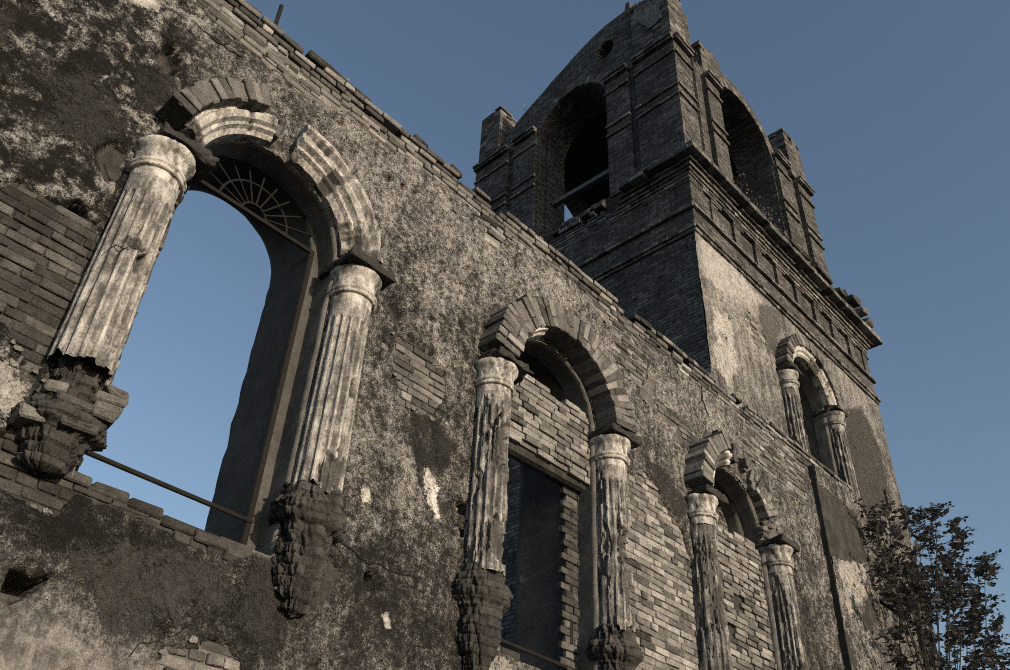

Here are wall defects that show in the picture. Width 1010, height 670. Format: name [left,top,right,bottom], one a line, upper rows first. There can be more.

hole [154,41,183,76]
peeling [0,178,272,562]
peeling [381,306,445,421]
hole [0,570,38,605]
peeling [155,635,240,670]